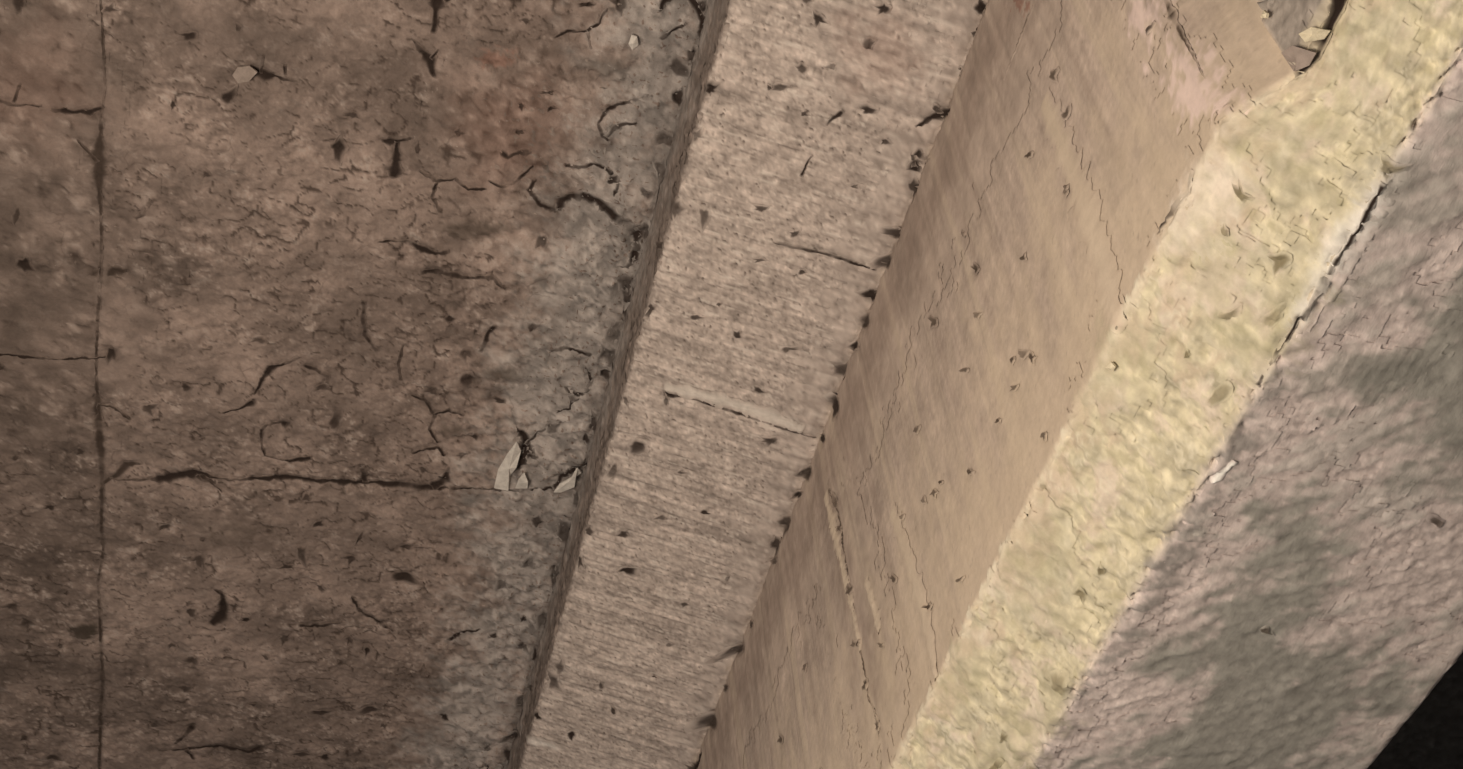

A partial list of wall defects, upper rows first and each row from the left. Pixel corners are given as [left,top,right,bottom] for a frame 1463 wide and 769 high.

crack [554,8,608,49]
crack [657,0,705,41]
crack [1145,0,1205,79]
crack [377,93,652,291]
crack [0,0,594,769]
peeling [494,441,528,491]
crack [829,489,855,612]
crack [860,650,880,736]